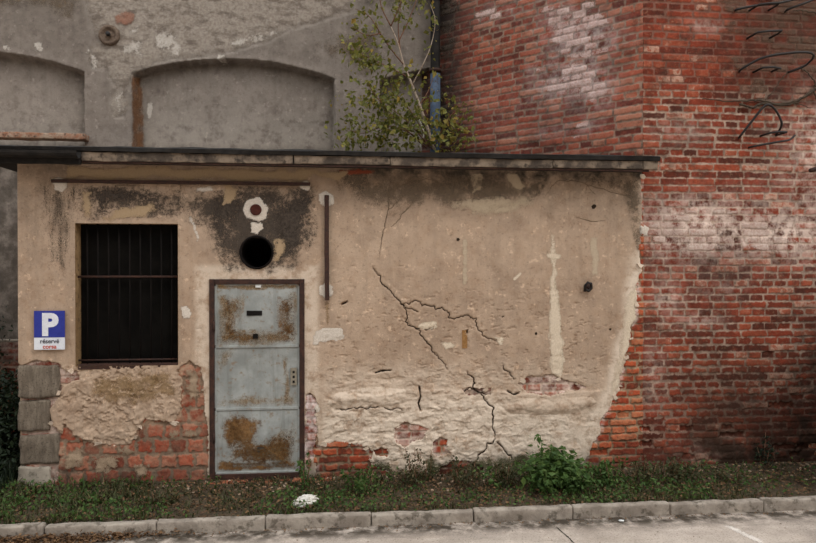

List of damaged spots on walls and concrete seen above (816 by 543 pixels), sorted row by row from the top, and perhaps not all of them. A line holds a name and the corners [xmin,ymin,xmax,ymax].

rust [131,76,144,147]
damp [338,171,546,217]
damp [565,176,640,247]
crack [374,176,483,366]
damp [546,234,565,377]
spalling [582,174,646,469]
spalling [17,360,209,486]
spalling [305,394,389,477]
spalling [394,422,483,474]
crack [464,372,512,461]
spalling [508,374,586,396]